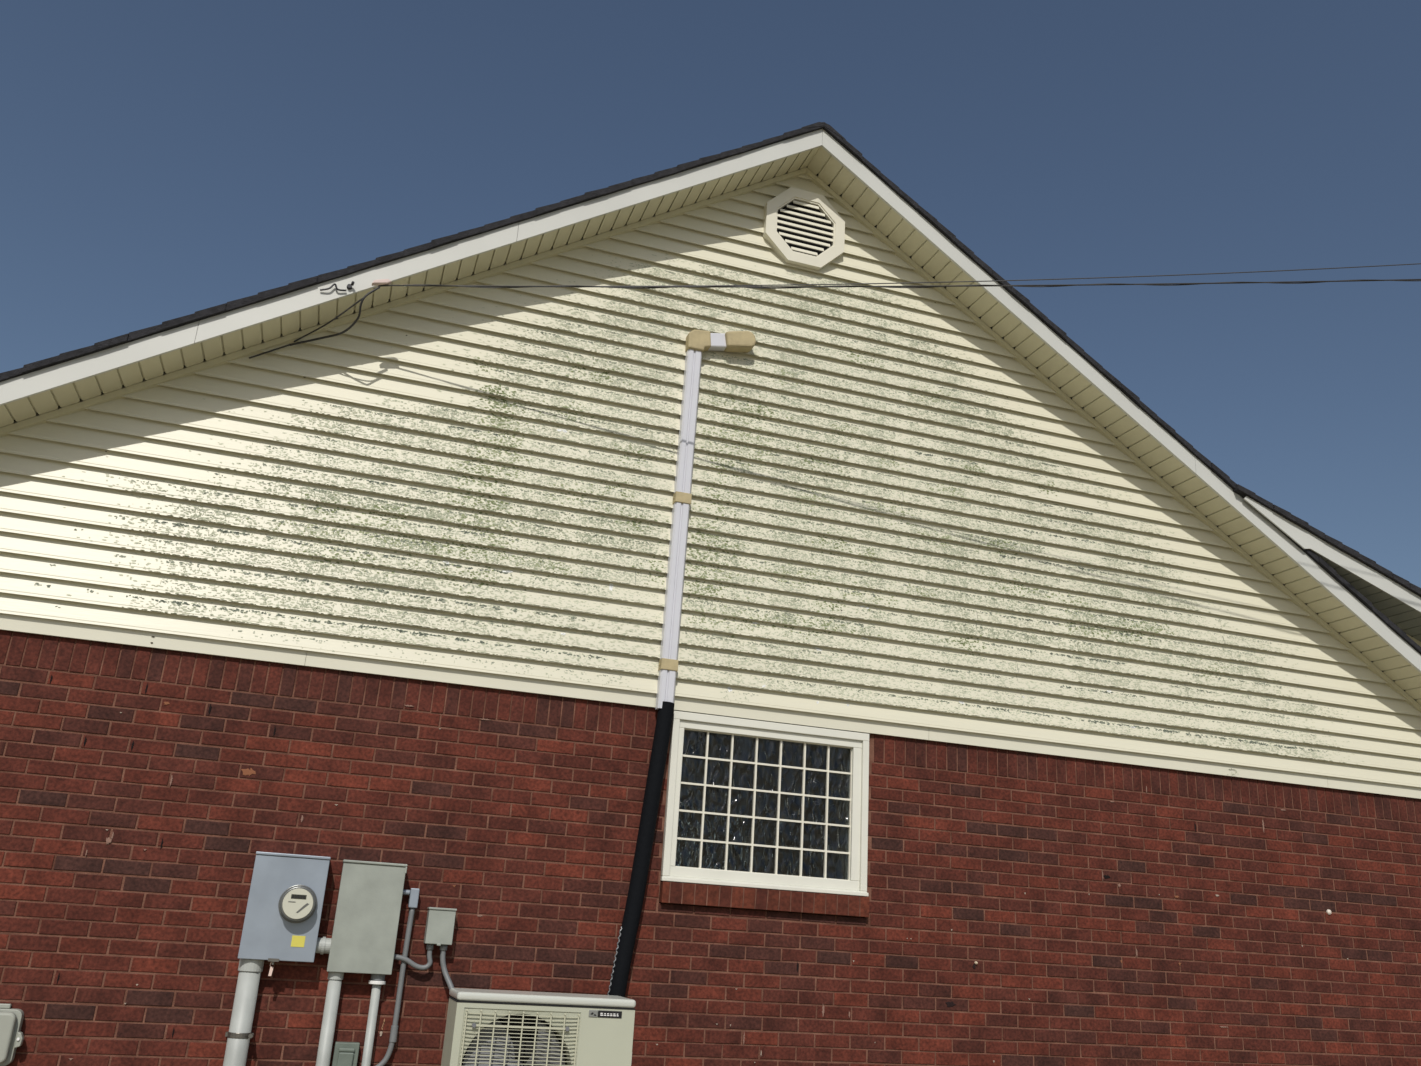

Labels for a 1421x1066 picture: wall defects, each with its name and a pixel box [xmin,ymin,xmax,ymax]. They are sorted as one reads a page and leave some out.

leakage [55,254,1364,764]